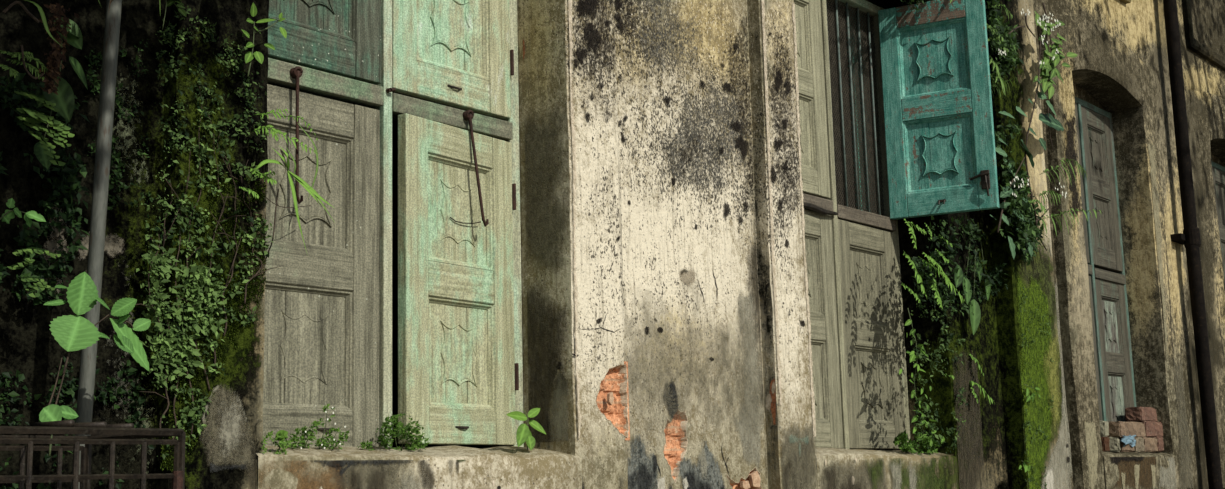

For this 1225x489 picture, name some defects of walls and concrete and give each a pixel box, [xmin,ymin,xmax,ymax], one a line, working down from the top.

water stain [571,0,755,224]
water stain [767,18,801,229]
water stain [728,244,767,466]
water stain [312,460,435,489]
flaking render [596,361,762,489]
water stain [782,427,916,489]
water stain [953,356,984,489]
water stain [1046,469,1054,489]